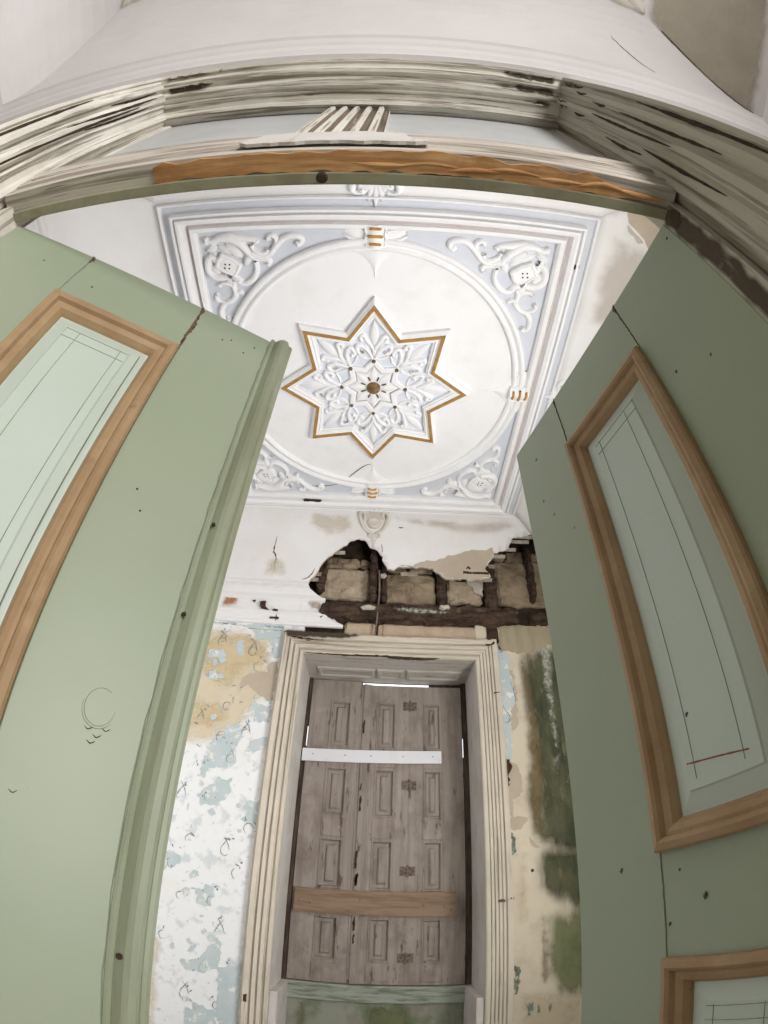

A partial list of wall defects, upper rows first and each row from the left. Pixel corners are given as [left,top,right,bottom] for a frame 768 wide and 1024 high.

peeling [627,210,682,249]
peeling [310,537,521,597]
damp [522,646,580,907]
peeling [164,850,181,870]
peeling [170,870,247,1024]